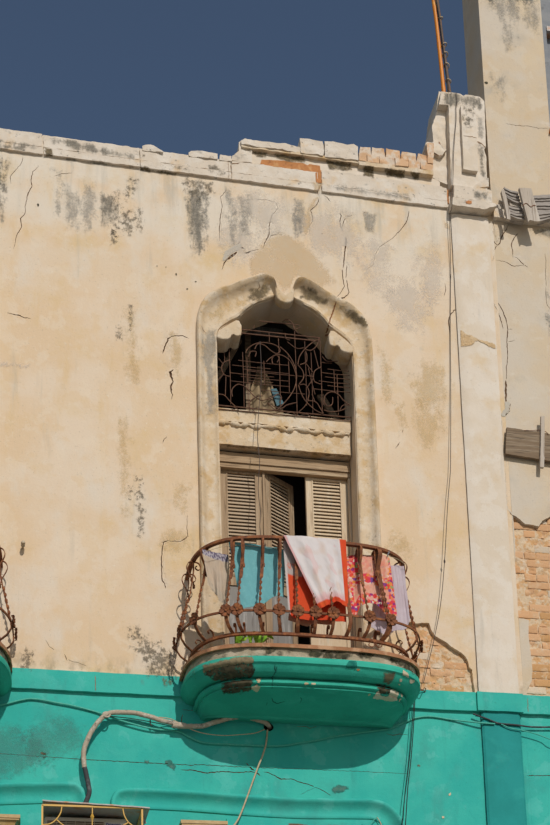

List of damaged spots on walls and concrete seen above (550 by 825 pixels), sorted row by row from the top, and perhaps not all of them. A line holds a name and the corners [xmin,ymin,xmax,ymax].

crack [10,159,38,246]
leakage [68,194,143,243]
leakage [185,180,213,252]
crack [219,163,281,269]
crack [492,222,548,306]
crack [162,328,205,400]
spalling [460,330,496,348]
crack [161,516,189,588]